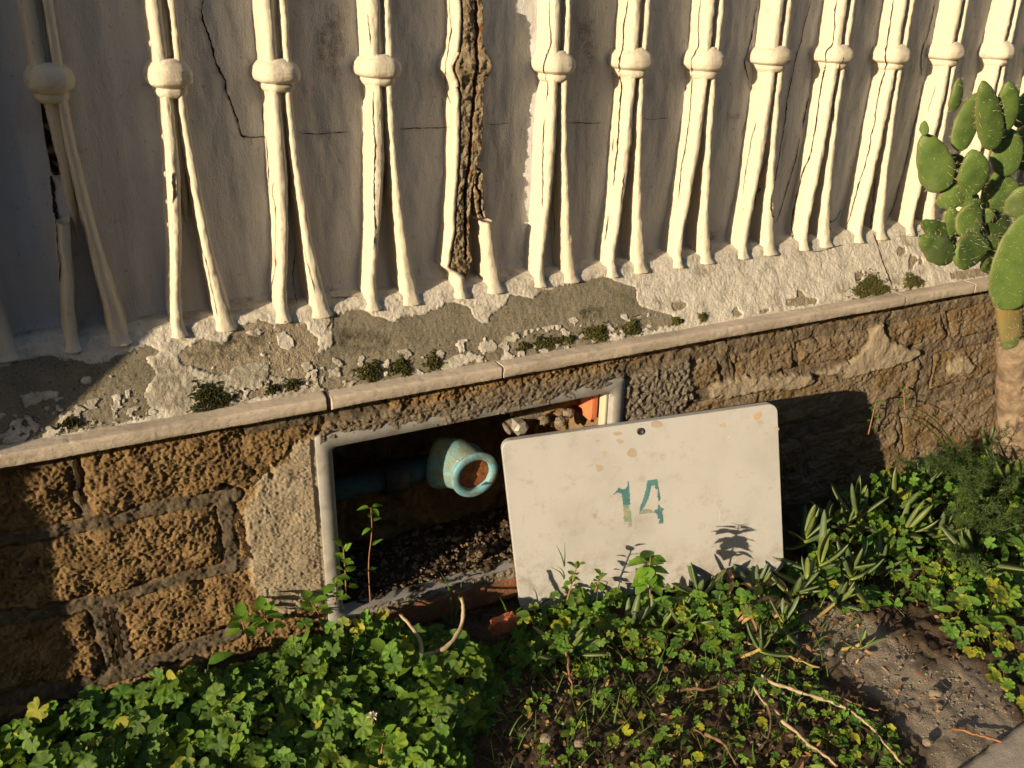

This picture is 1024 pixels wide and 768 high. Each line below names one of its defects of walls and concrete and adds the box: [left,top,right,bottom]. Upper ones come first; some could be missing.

crack [201,1,353,331]
spalling [449,0,493,279]
crack [50,176,61,282]
peeling [0,345,159,445]
peeling [179,277,686,401]